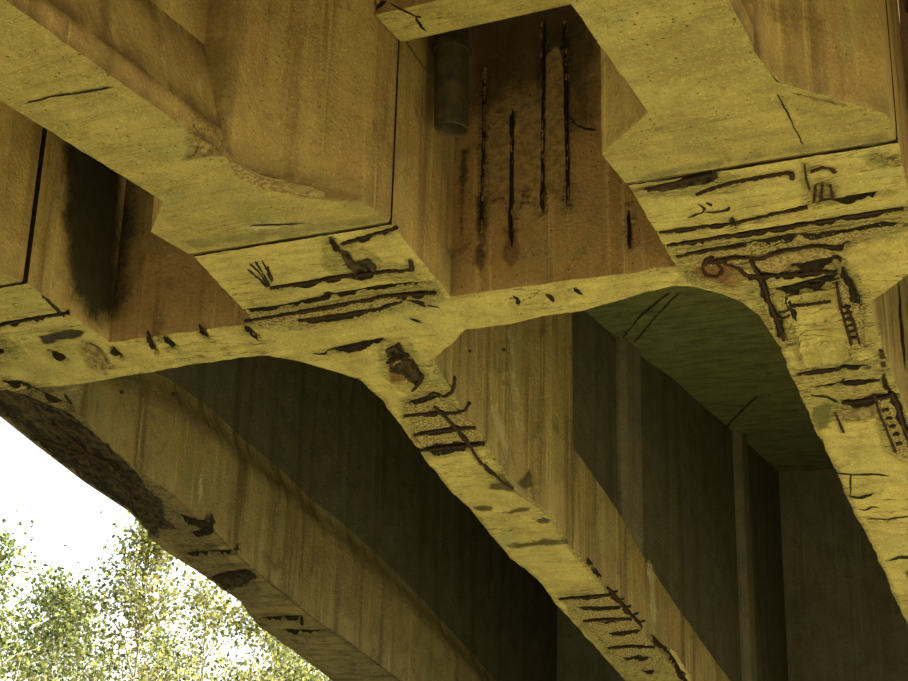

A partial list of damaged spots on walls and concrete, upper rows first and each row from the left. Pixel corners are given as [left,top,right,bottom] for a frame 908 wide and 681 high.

crack [25,87,113,104]
crack [777,94,803,145]
spalling [0,310,70,327]
leakage [62,141,135,321]
spalling [146,330,176,351]
spalling [244,225,436,335]
spalling [642,164,904,368]
spalling [0,388,176,535]
spalling [312,338,514,490]
spalling [181,513,216,537]
spalling [211,569,256,590]
spalling [559,586,691,681]